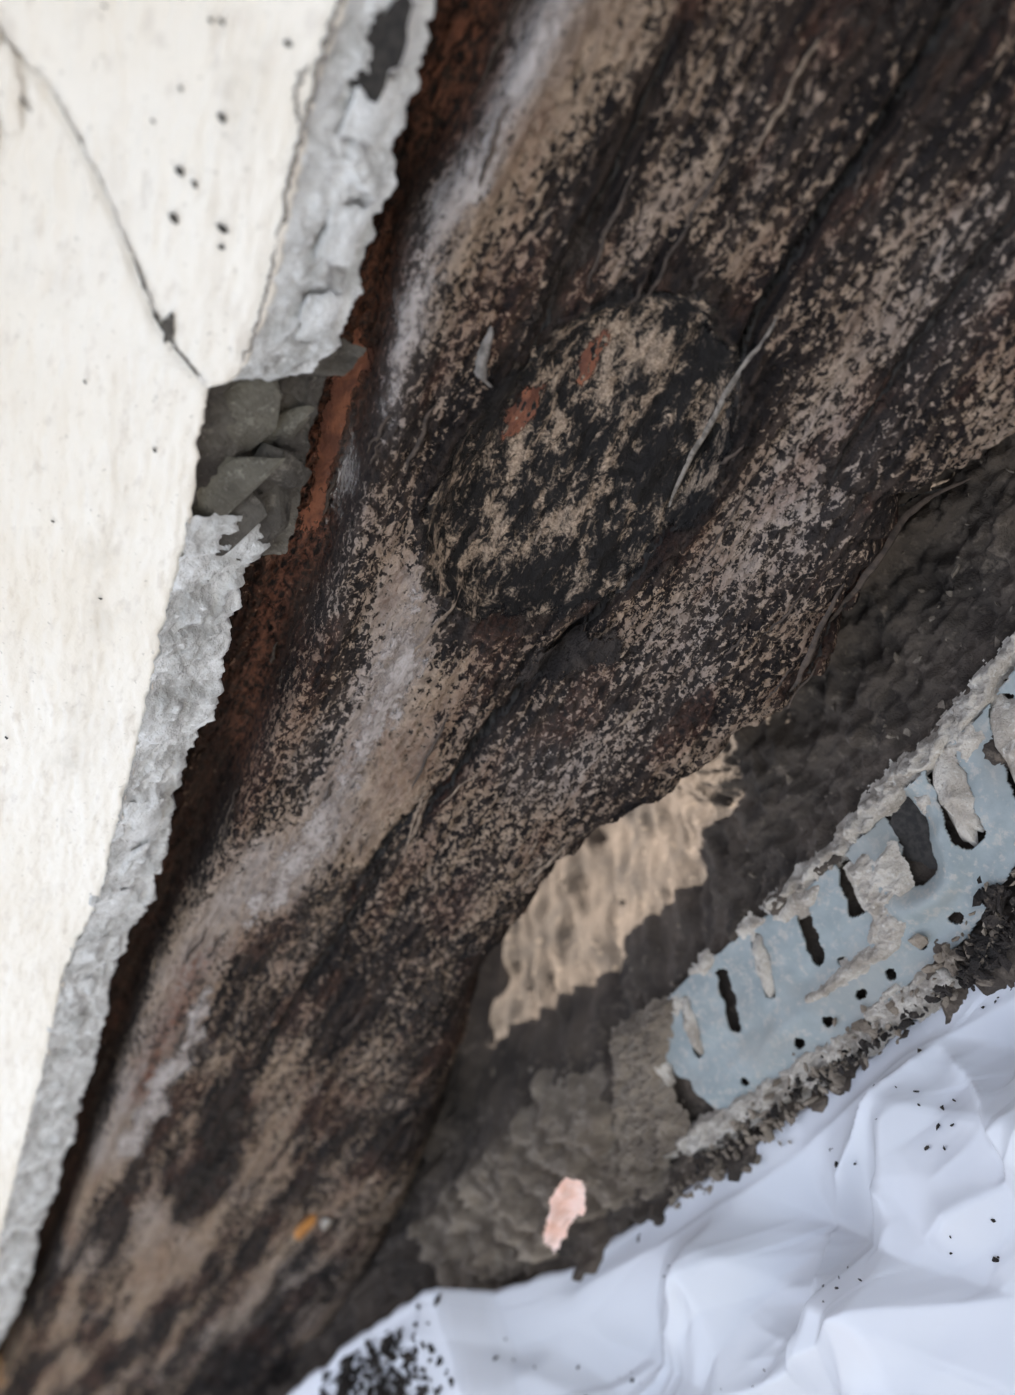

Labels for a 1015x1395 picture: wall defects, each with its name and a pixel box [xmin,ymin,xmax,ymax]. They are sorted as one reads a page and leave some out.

crack [1,33,206,388]
spalling [0,0,435,1341]
spalling [664,967,962,1158]